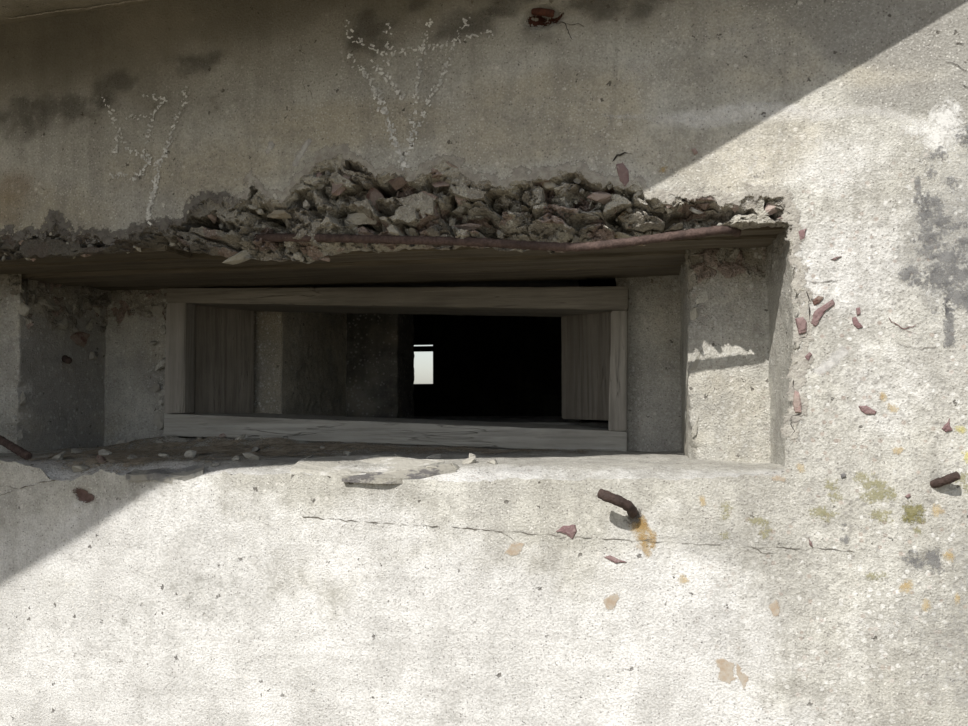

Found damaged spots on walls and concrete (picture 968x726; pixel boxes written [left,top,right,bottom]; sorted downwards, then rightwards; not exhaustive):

spalling [0,143,835,443]
rust [0,435,32,460]
rust [626,510,655,555]